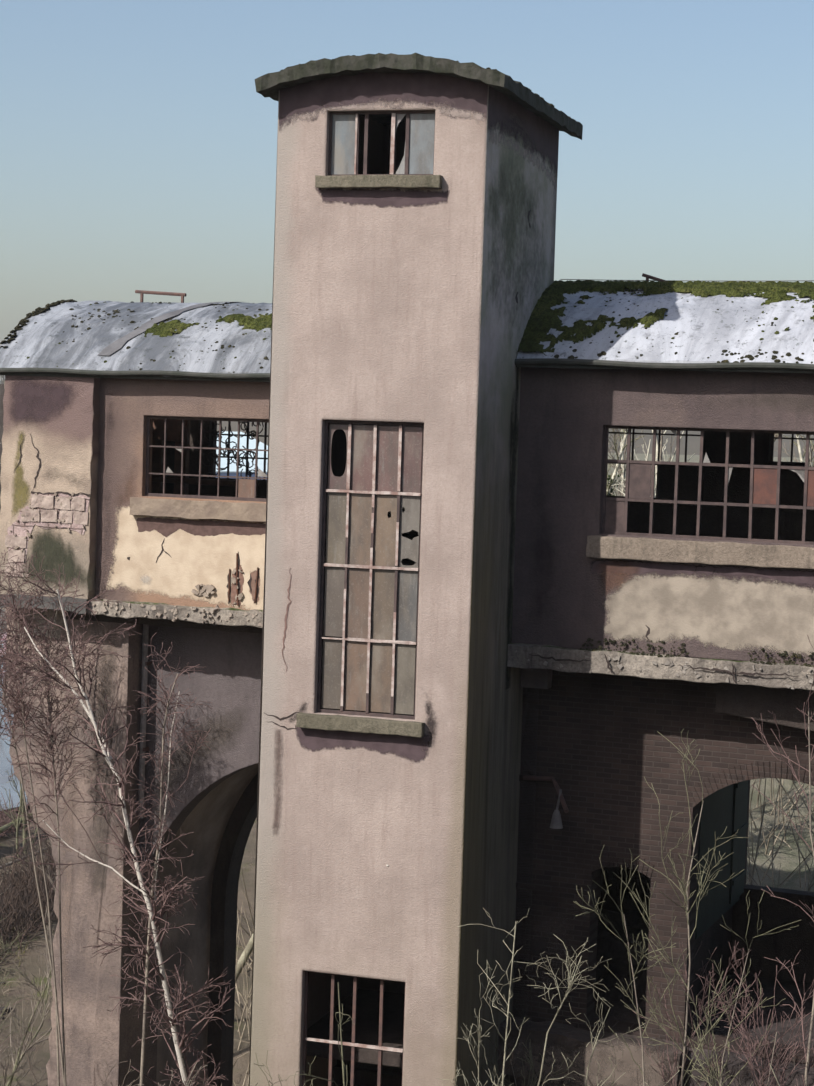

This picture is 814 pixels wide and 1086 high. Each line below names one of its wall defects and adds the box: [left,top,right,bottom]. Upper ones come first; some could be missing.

water stain [11,379,71,422]
crack [14,434,90,496]
peeling [92,507,266,627]
peeling [603,573,814,655]
spalling [652,660,762,683]
crack [263,712,299,730]
water stain [291,704,435,762]